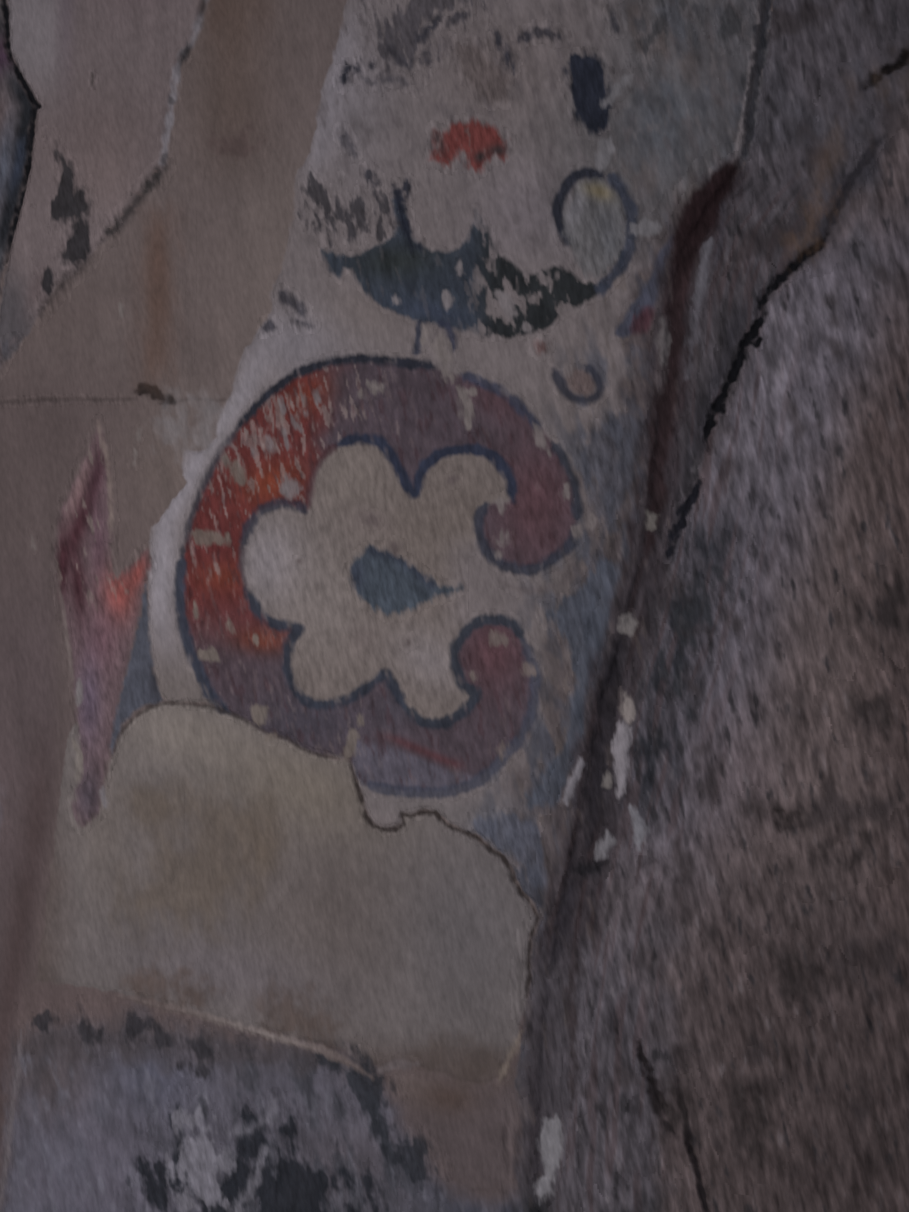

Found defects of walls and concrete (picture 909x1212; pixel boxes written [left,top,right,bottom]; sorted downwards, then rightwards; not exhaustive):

crack [0,0,44,266]
peeling [591,131,619,177]
peeling [596,69,636,114]
peeling [286,156,406,260]
peeling [414,255,480,434]
peeling [218,381,327,507]
crack [660,262,809,564]
peeling [194,613,265,668]
peeling [246,700,281,746]